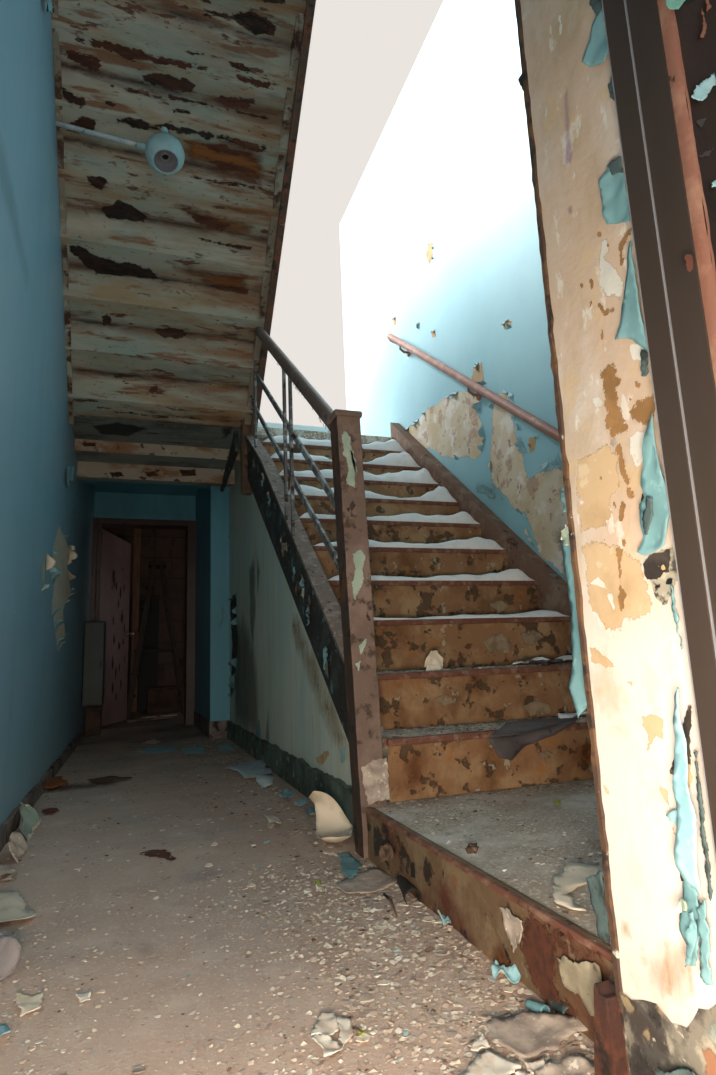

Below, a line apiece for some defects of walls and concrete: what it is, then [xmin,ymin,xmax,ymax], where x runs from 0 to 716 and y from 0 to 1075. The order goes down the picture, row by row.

peeling [582,0,608,67]
peeling [666,0,693,10]
peeling [700,0,712,38]
peeling [691,73,716,101]
peeling [598,156,630,224]
peeling [615,241,649,377]
peeling [405,362,683,718]
peeling [41,526,78,651]
peeling [642,687,713,986]
corrosion [520,909,601,1019]
peeling [557,956,602,1016]
flaking render [620,992,716,1075]